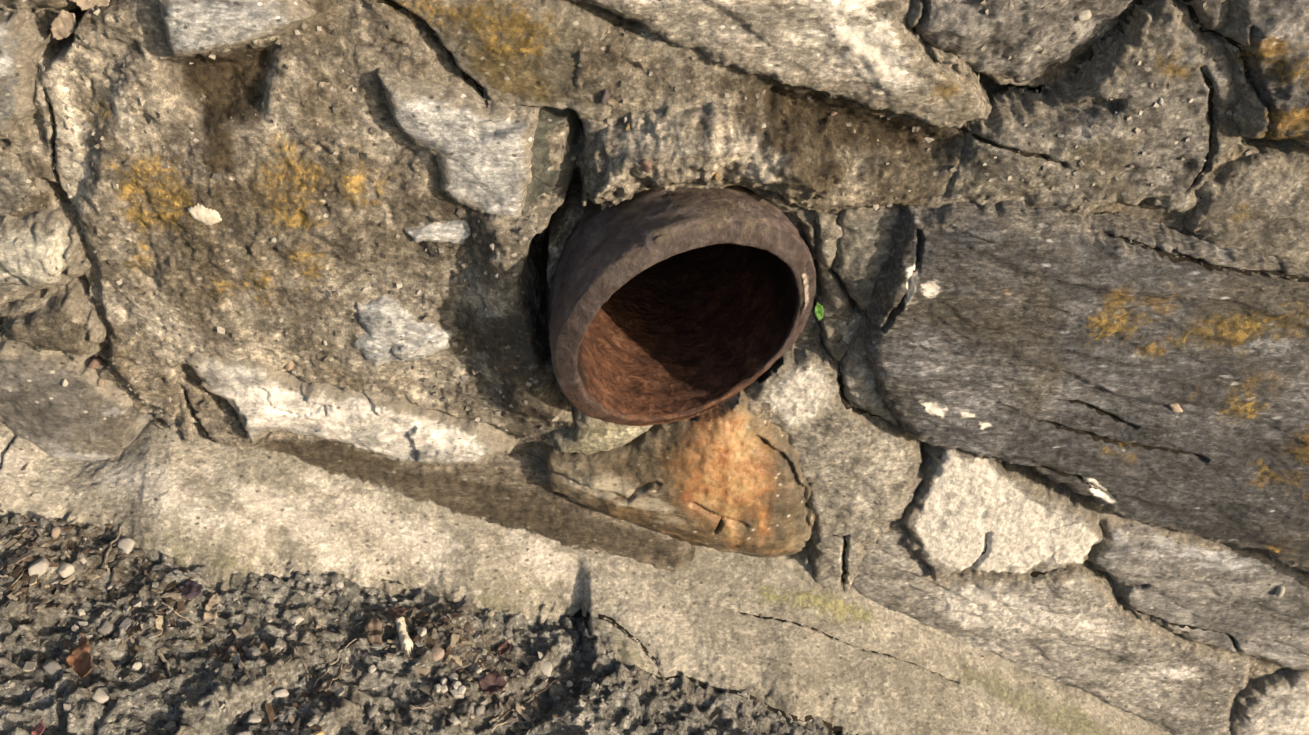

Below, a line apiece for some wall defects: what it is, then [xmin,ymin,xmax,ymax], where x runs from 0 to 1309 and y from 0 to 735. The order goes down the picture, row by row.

crack [1183,0,1253,85]
crack [951,127,1063,164]
crack [1190,67,1214,187]
crack [1104,231,1309,282]
crack [1037,399,1203,458]
corrosion [638,406,769,548]
crack [566,609,858,735]
crack [739,612,958,683]